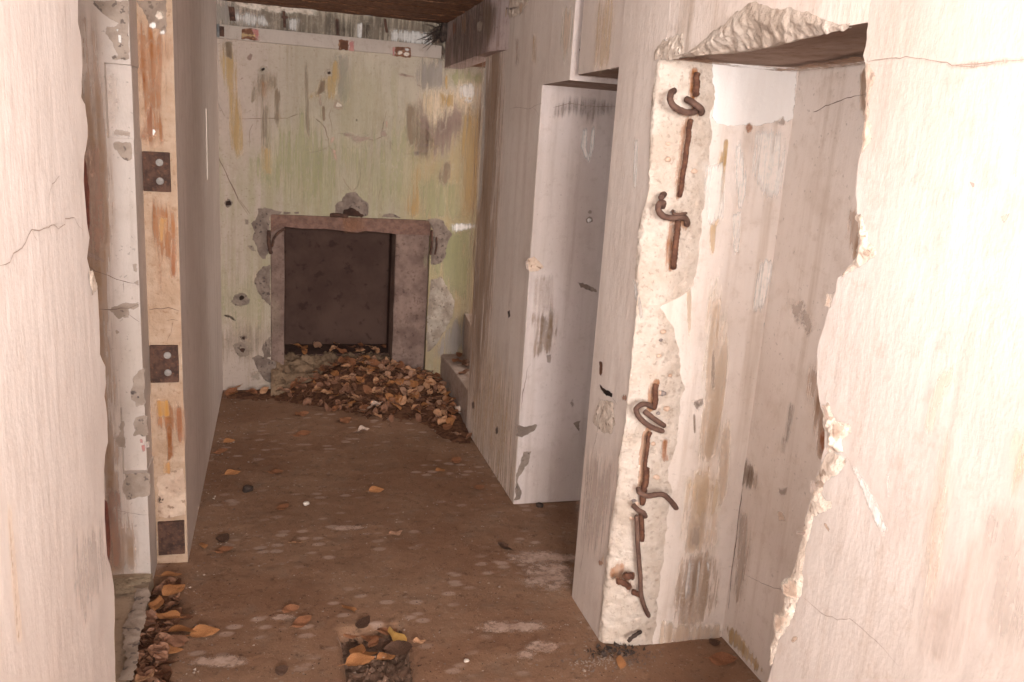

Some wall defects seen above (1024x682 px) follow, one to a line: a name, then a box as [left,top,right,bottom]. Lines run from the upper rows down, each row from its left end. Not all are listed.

peeling [93,0,167,60]
corrosion [139,22,163,143]
leakage [393,25,483,231]
corrosion [676,57,730,199]
corrosion [766,57,866,113]
crack [868,56,1023,68]
crack [0,217,79,266]
flaking render [245,207,299,305]
flaking render [426,218,455,352]
spalling [590,1,851,665]
flaking render [842,214,876,277]
corrosion [157,400,183,474]